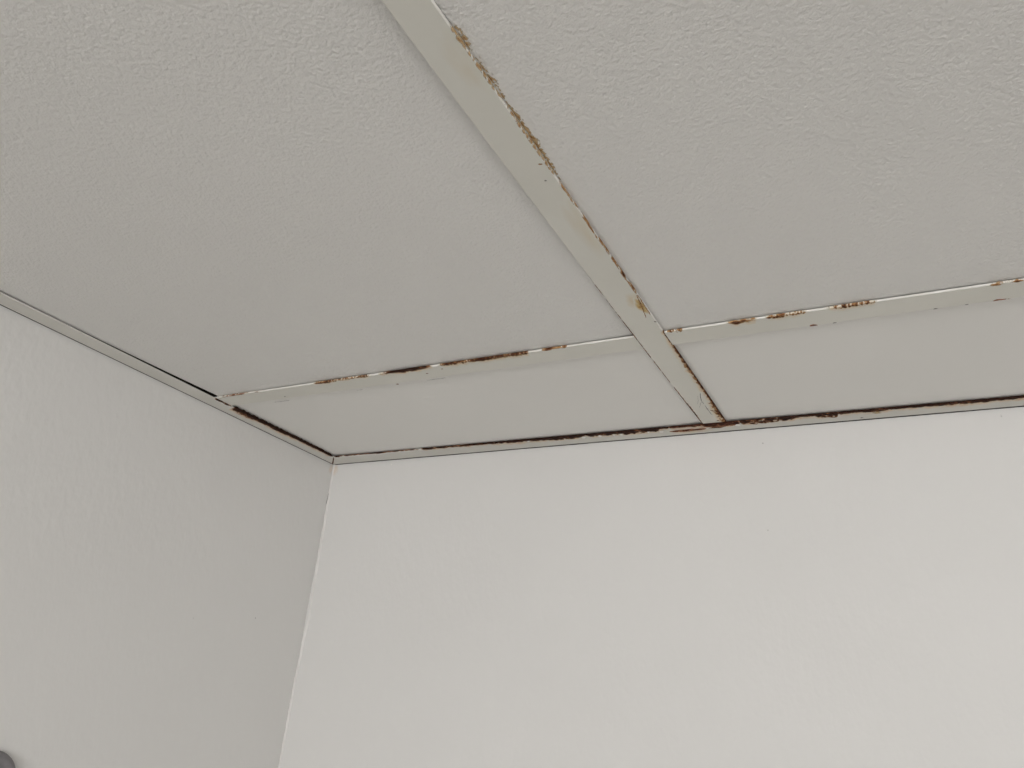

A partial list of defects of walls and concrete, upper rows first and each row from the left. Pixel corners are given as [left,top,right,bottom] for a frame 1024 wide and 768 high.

corrosion [215,26,1024,464]